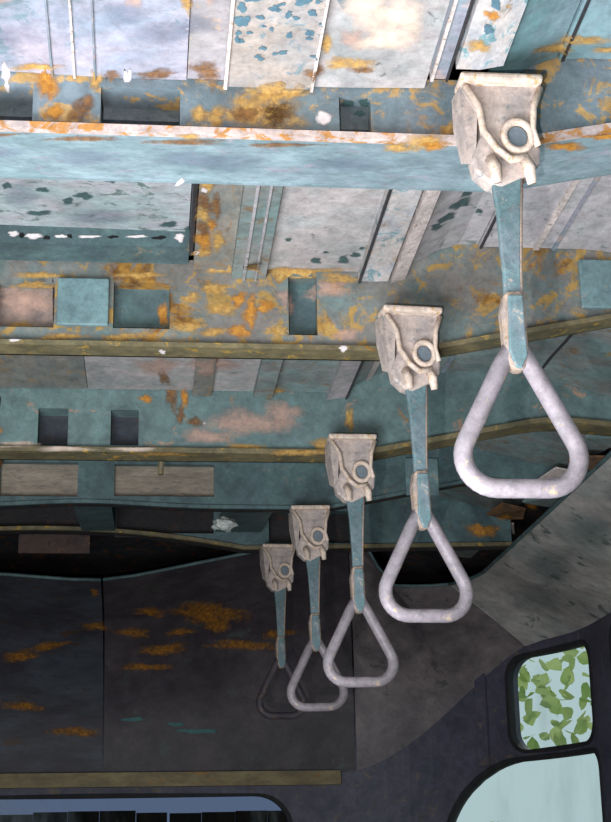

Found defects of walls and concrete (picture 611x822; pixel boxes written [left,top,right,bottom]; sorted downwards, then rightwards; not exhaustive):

peeling [254,46,287,61]
peeling [234,0,322,43]
corrosion [307,36,372,82]
peeling [338,0,419,48]
corrosion [539,35,611,53]
corrosion [19,62,171,120]
corrosion [193,81,304,128]
corrosion [152,134,209,145]
corrosion [191,184,224,256]
corrosion [8,272,62,327]
corrosion [158,284,273,337]
corrosion [243,264,355,312]